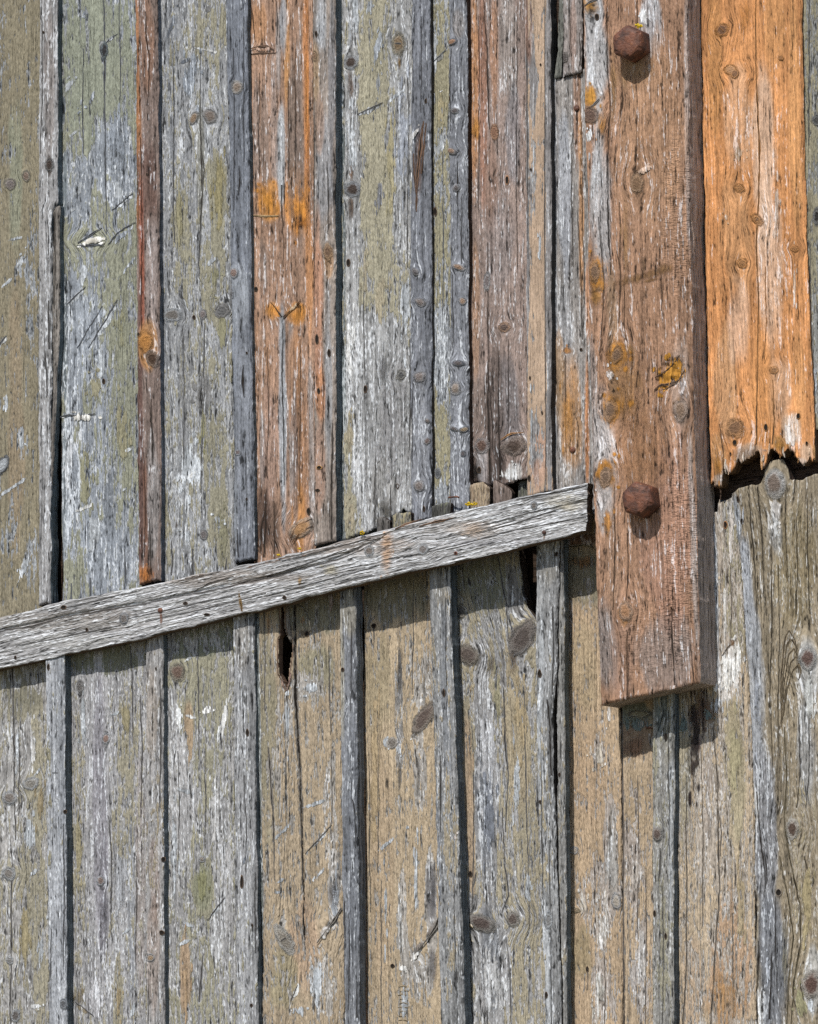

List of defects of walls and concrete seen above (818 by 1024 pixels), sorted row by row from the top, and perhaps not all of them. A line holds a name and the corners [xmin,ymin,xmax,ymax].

crack [0,0,626,1024]